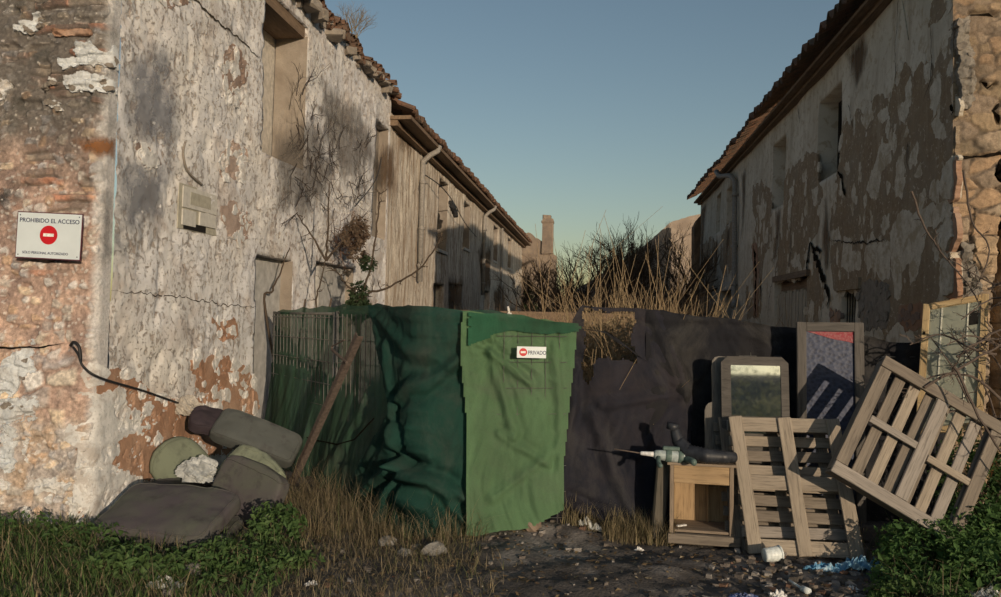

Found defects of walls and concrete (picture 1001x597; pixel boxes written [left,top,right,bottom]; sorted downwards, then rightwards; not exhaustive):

peeling [12,11,120,112]
leakage [132,56,174,135]
crack [981,82,1000,123]
leakage [126,167,161,222]
peeling [745,0,977,343]
crack [963,151,1001,182]
crack [752,226,885,318]
peeling [957,242,983,298]
peeling [190,315,260,416]
peeling [0,339,40,491]
peeling [26,362,232,528]